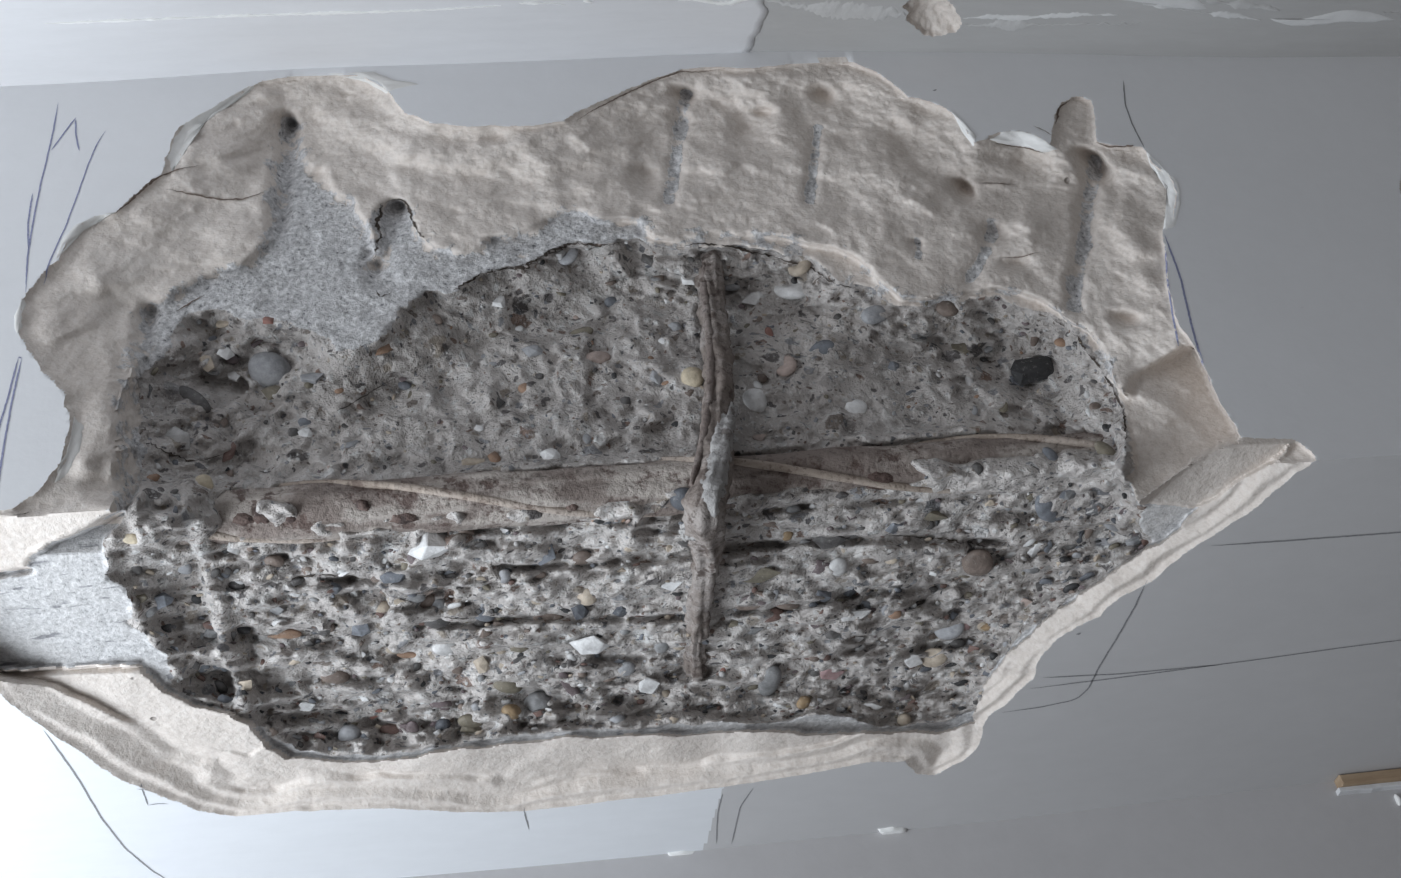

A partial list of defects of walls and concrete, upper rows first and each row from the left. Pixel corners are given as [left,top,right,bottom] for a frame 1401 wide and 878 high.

peeling [1271,10,1394,26]
peeling [0,0,768,86]
peeling [166,86,254,171]
peeling [951,111,976,146]
peeling [990,131,1057,153]
peeling [1146,152,1181,230]
peeling [56,212,115,259]
peeling [55,417,84,482]
spalling [256,500,297,527]
spalling [896,693,919,711]
spalling [428,717,454,735]
spalling [460,726,483,735]